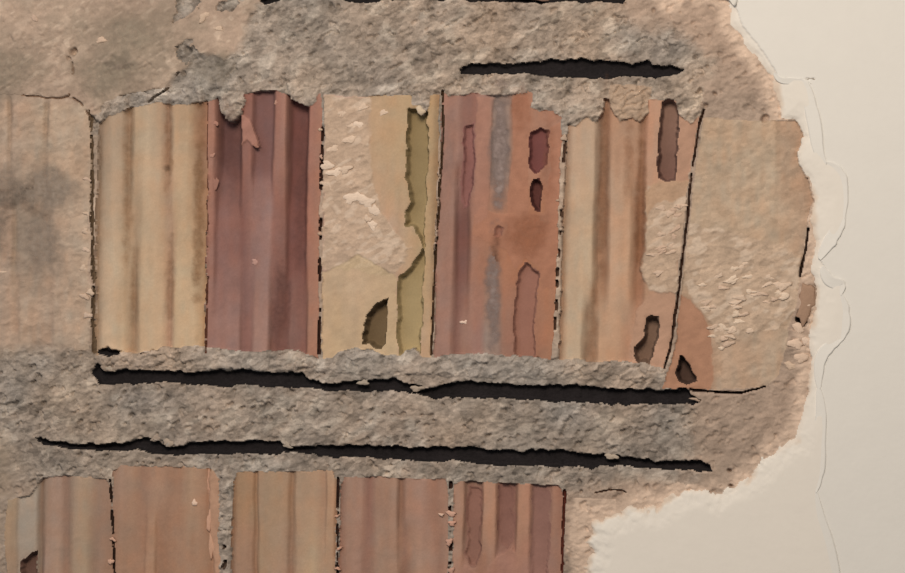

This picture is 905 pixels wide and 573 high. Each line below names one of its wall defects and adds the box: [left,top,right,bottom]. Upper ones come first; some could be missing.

crack [260,0,280,8]
crack [344,0,394,8]
crack [438,0,625,8]
crack [460,57,684,79]
spalling [526,126,552,216]
spalling [654,96,683,184]
crack [21,61,766,406]
spalling [360,105,432,356]
spalling [632,314,662,364]
spalling [673,353,701,387]
crack [36,433,712,573]
spalling [462,483,518,569]